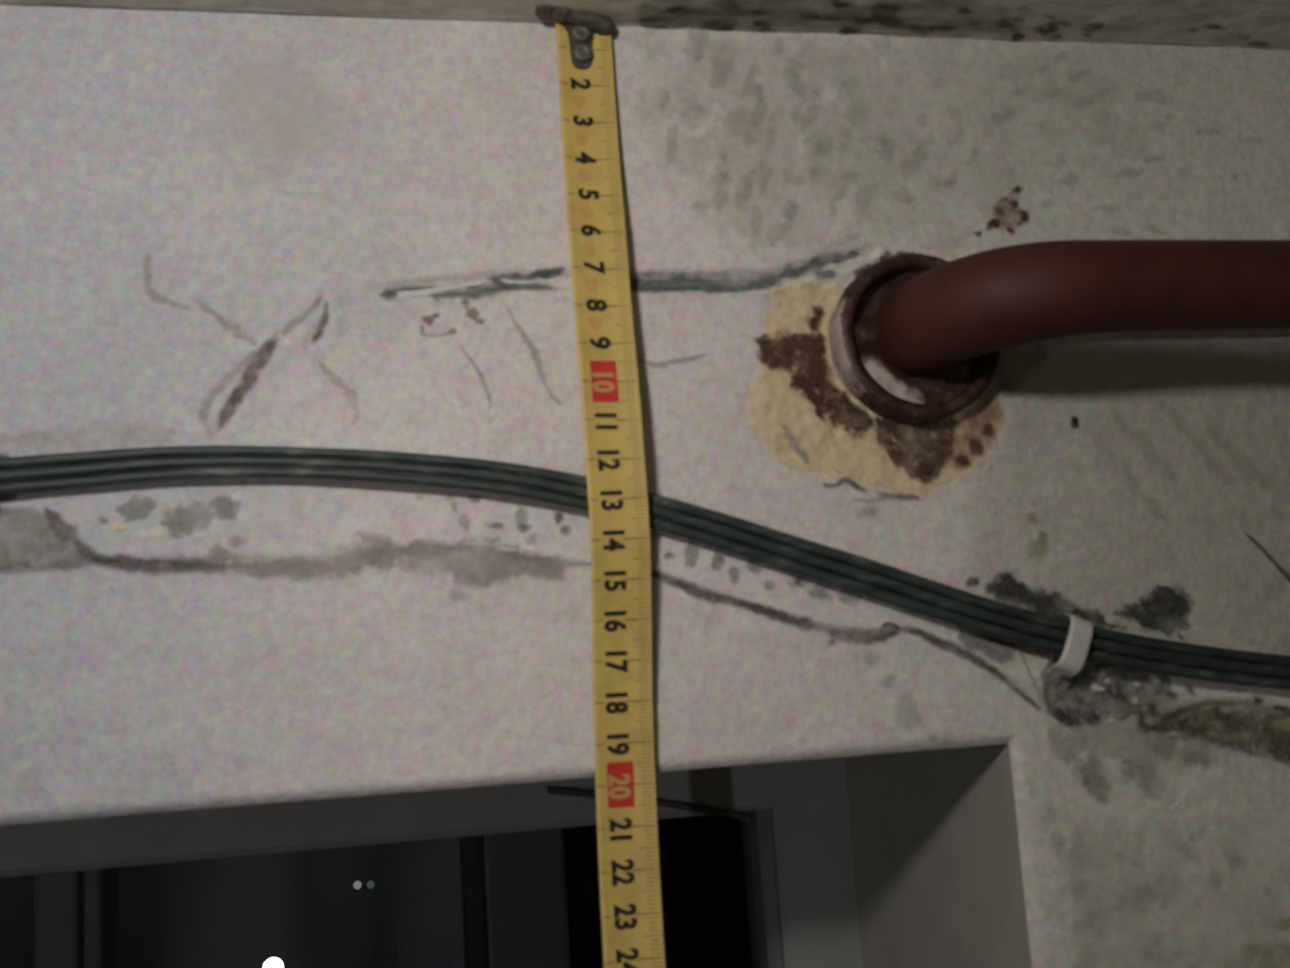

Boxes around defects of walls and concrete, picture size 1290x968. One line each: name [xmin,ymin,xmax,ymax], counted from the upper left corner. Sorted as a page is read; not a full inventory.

mould [637,0,1103,41]
corrosion [974,186,1029,236]
crack [312,311,328,343]
crack [220,340,277,427]
corrosion [756,306,1002,482]
water stain [157,545,239,571]
water stain [346,539,562,587]
crack [651,572,1040,710]
spalling [958,627,1290,762]